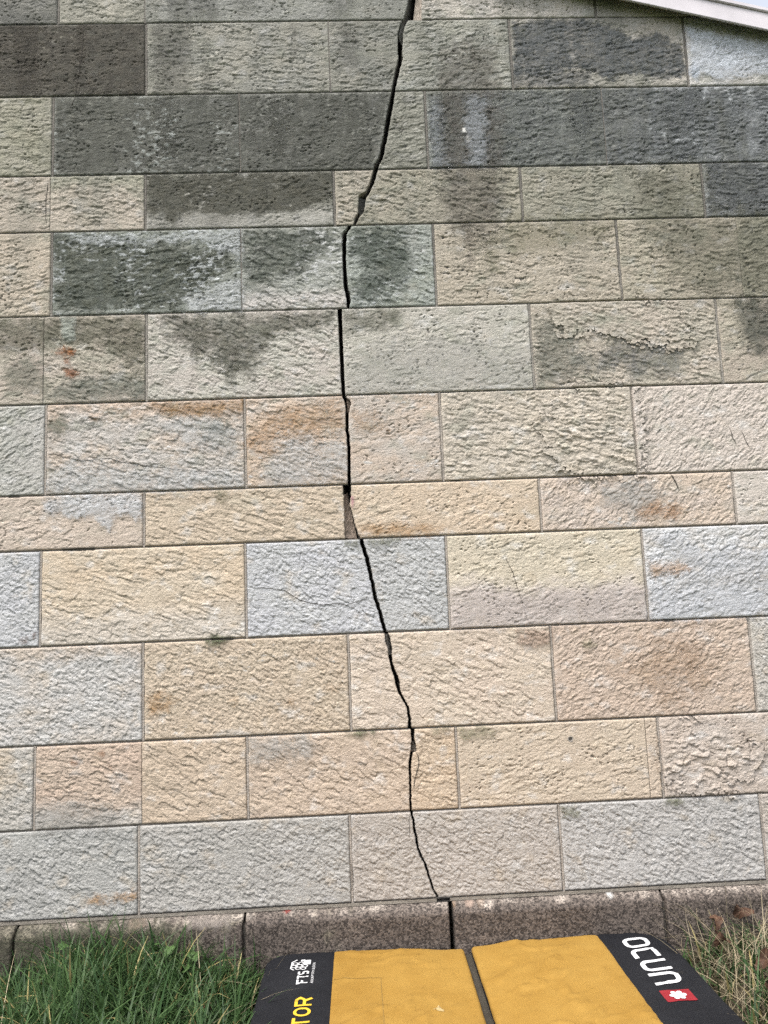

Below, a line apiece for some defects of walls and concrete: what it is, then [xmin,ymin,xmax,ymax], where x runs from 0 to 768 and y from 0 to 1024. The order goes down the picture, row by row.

leakage [513,18,768,123]
leakage [0,24,384,253]
leakage [60,317,75,340]
leakage [187,280,243,312]
crack [255,0,455,949]